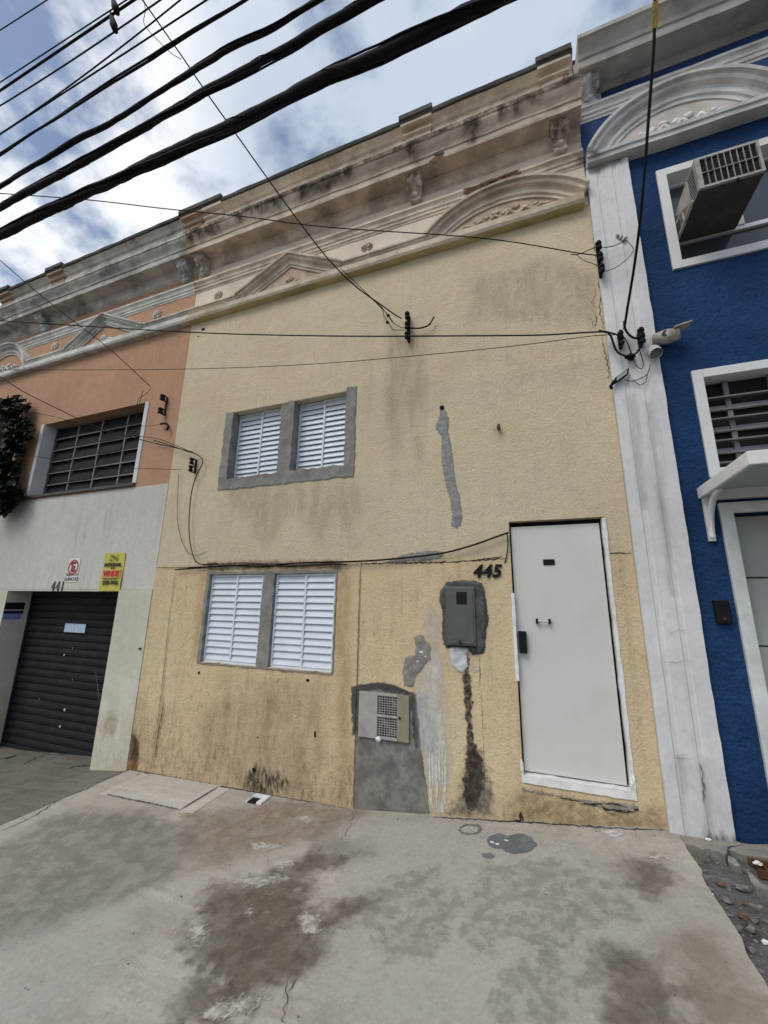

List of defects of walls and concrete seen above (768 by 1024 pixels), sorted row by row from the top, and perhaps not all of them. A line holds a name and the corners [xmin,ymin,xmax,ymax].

flaking render [402,635,431,687]
damp [449,658,492,815]
damp [247,766,288,794]
damp [429,745,446,808]
flaking render [522,788,639,814]